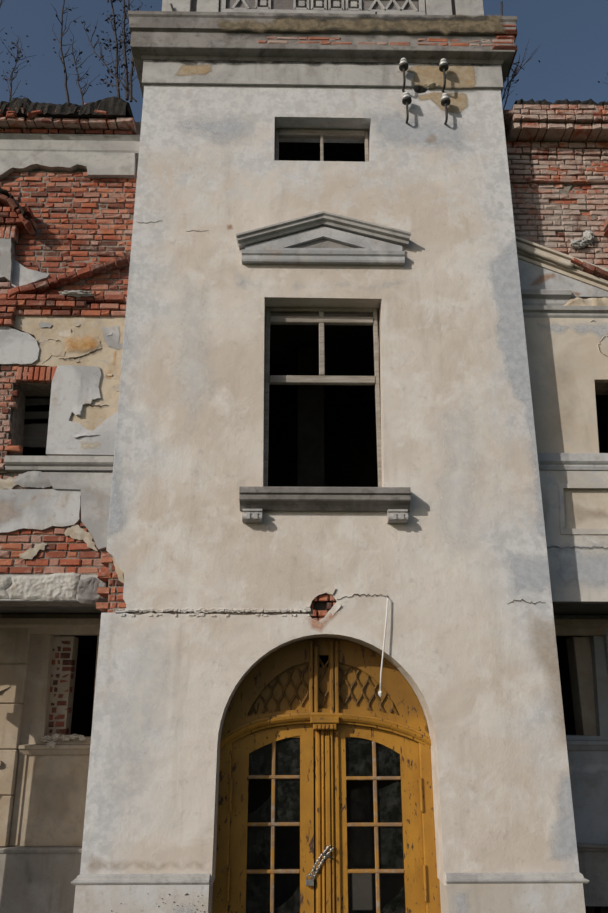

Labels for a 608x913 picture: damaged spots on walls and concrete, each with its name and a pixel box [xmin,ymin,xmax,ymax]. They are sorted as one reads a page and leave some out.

spalling [401,66,475,113]
flaking render [510,163,608,269]
flaking render [0,171,137,312]
crack [590,319,608,357]
flaking render [0,365,53,489]
peeling [71,395,99,415]
leakage [492,242,545,534]
flaking render [0,510,126,613]
crack [113,607,313,617]
spalling [305,588,341,621]
crack [337,592,388,600]
crack [507,597,546,605]